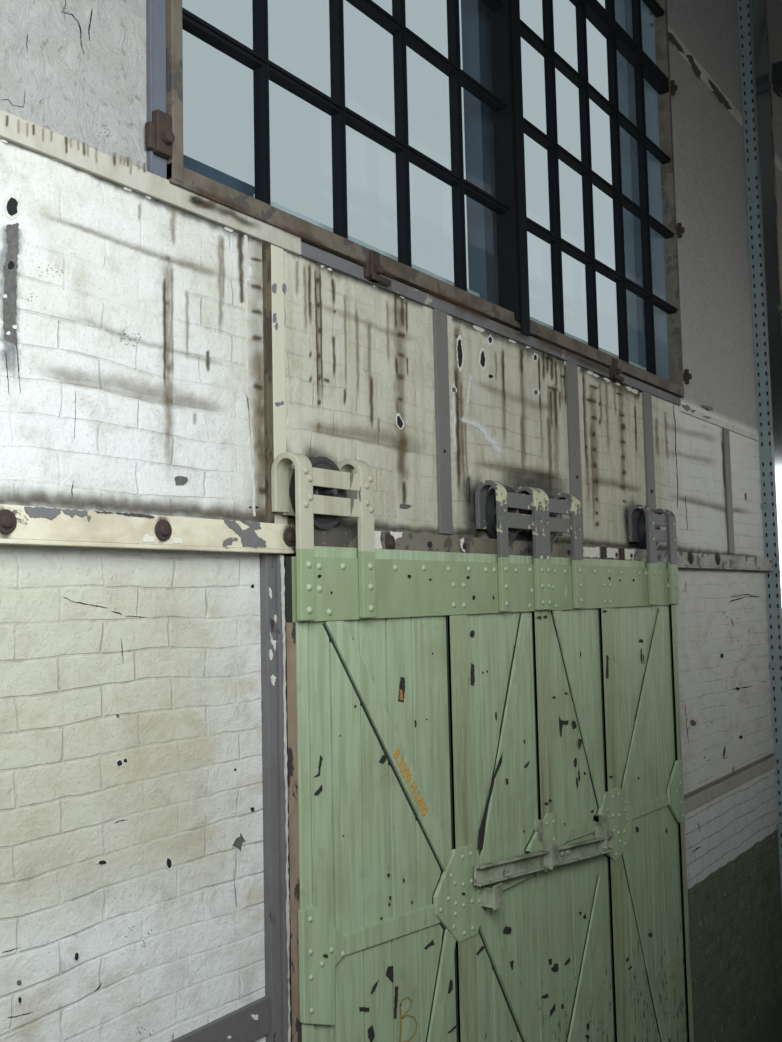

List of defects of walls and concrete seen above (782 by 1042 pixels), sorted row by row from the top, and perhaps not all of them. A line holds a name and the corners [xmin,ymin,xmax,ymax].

crack [62,0,92,53]
peeling [668,32,732,110]
water stain [238,235,261,302]
peeling [91,174,267,548]
water stain [583,378,601,467]
peeling [24,506,155,522]